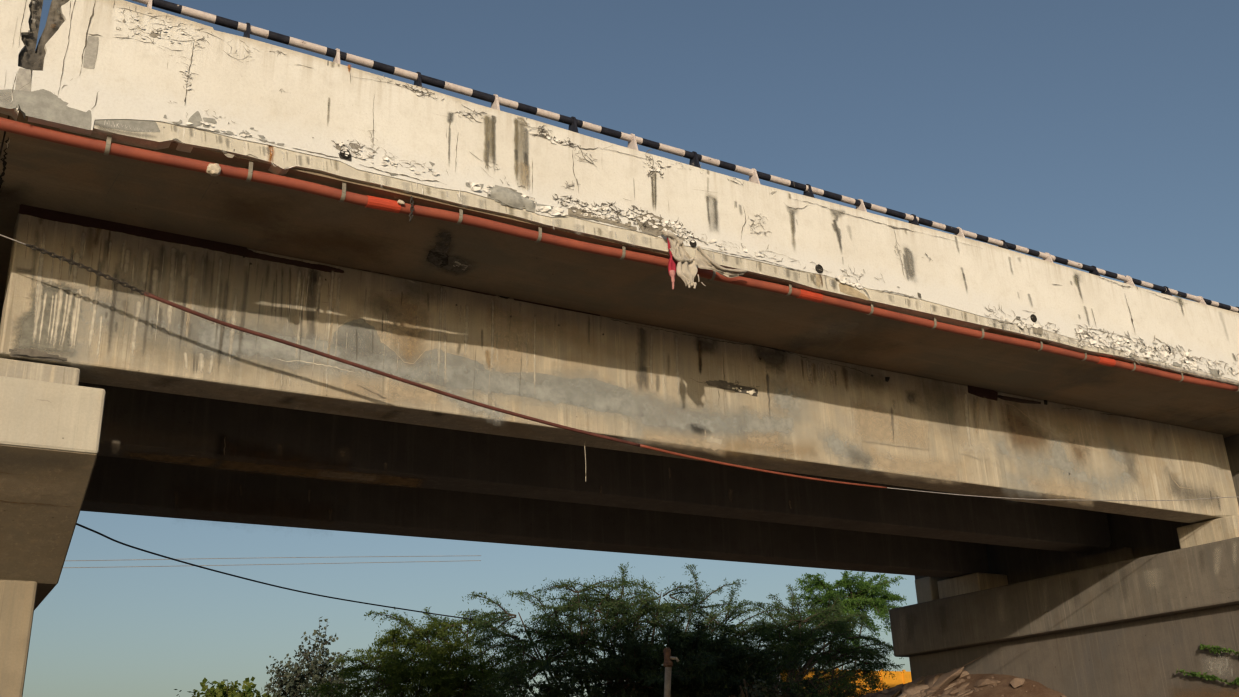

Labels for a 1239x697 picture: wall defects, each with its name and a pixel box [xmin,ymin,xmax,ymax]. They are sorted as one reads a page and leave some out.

spalling [18,0,69,75]
damp [448,113,533,191]
damp [607,149,666,205]
peeling [552,194,921,298]
damp [832,210,844,249]
damp [894,231,933,277]
damp [18,233,804,464]
peeling [985,304,1239,382]
spalling [691,378,760,406]
damp [998,401,1131,496]